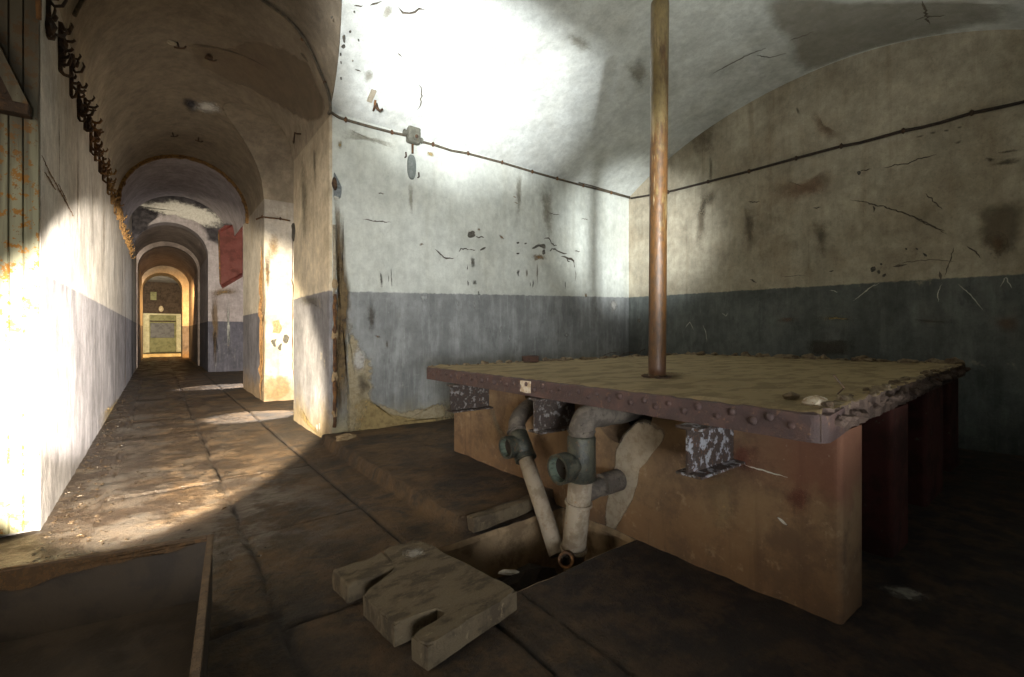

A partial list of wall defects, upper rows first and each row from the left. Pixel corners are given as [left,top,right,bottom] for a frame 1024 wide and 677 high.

crack [917,1,944,23]
crack [716,31,814,72]
crack [861,154,936,171]
crack [852,194,980,279]
spalling [271,320,289,351]
peeling [346,332,451,432]